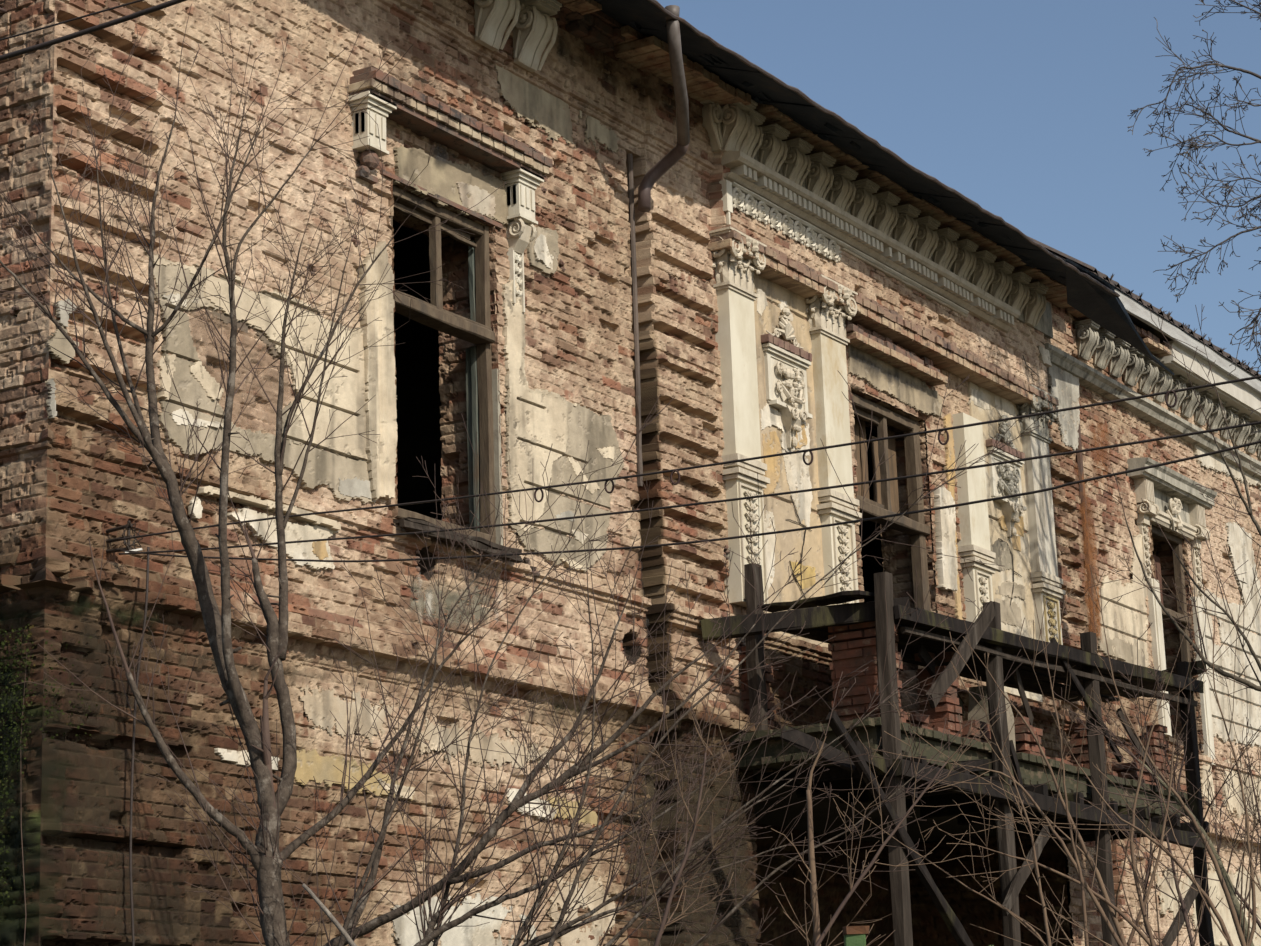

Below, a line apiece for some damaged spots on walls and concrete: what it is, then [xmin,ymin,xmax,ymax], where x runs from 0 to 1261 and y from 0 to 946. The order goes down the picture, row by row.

peeling [143,234,398,504]
peeling [501,280,624,577]
peeling [1096,533,1150,667]
peeling [1201,522,1261,748]
peeling [214,748,251,766]
peeling [294,685,416,801]
peeling [412,716,549,771]
peeling [505,788,598,826]
peeling [1199,753,1261,825]
peeling [391,893,537,946]
peeling [542,875,616,946]